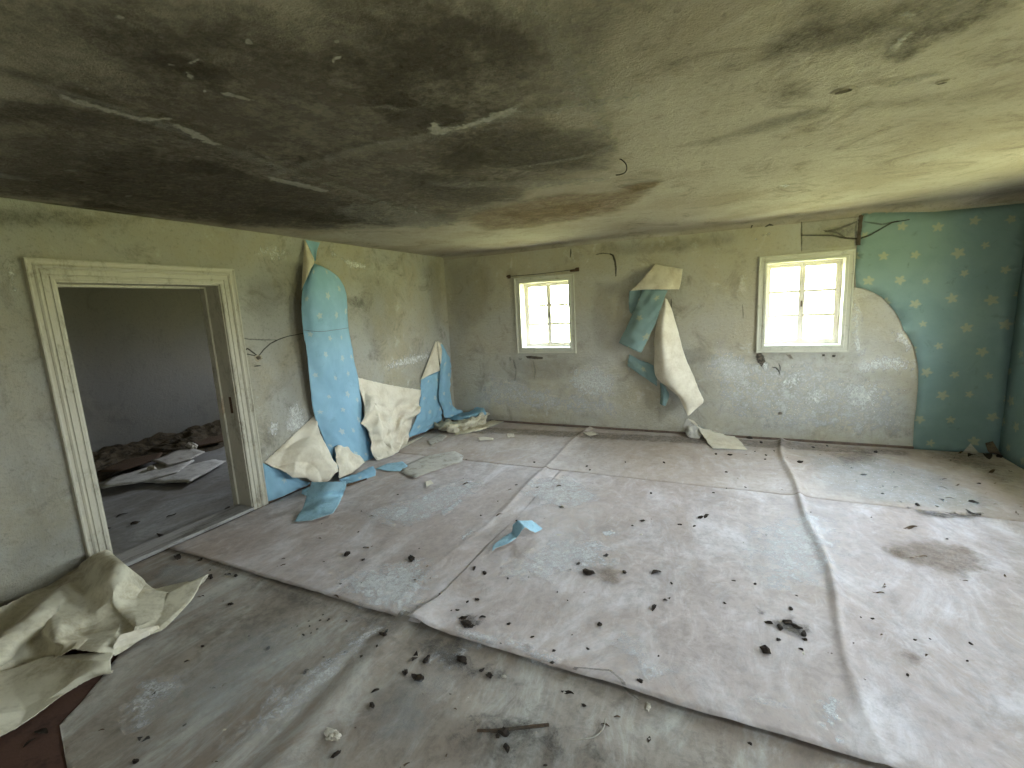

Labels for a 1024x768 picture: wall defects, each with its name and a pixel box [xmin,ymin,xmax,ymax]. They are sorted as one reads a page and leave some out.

water stain [770,0,991,59]
water stain [0,8,611,228]
peeling [263,403,376,501]